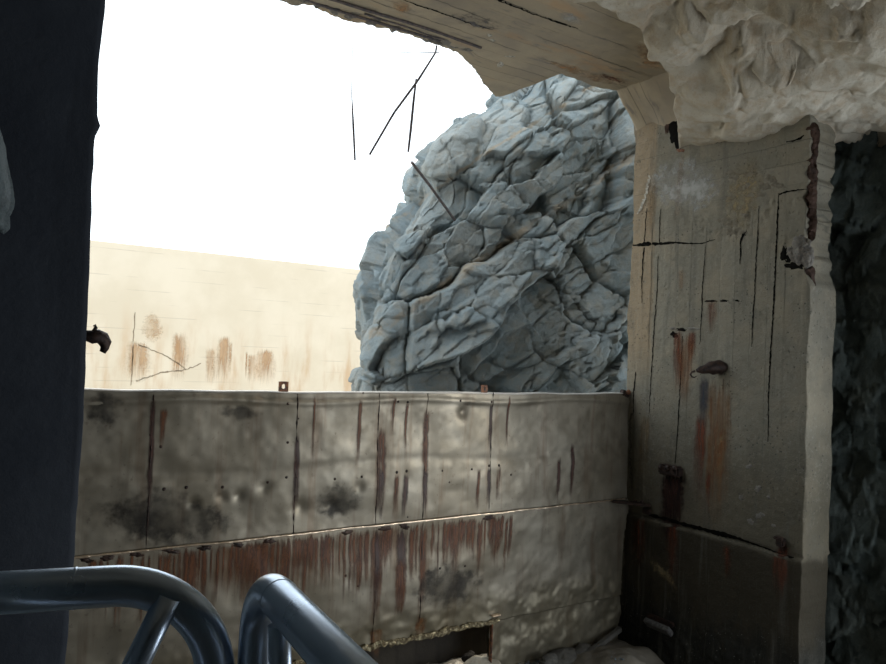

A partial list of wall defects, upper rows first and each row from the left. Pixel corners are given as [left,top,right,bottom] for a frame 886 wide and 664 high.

crack [404,0,489,29]
spalling [780,122,820,286]
crack [632,210,715,463]
crack [739,189,807,442]
corrosion [377,432,408,512]
corrosion [392,398,409,444]
corrosion [476,469,501,502]
corrosion [694,381,725,492]
corrosion [80,515,513,607]
crack [649,514,794,562]